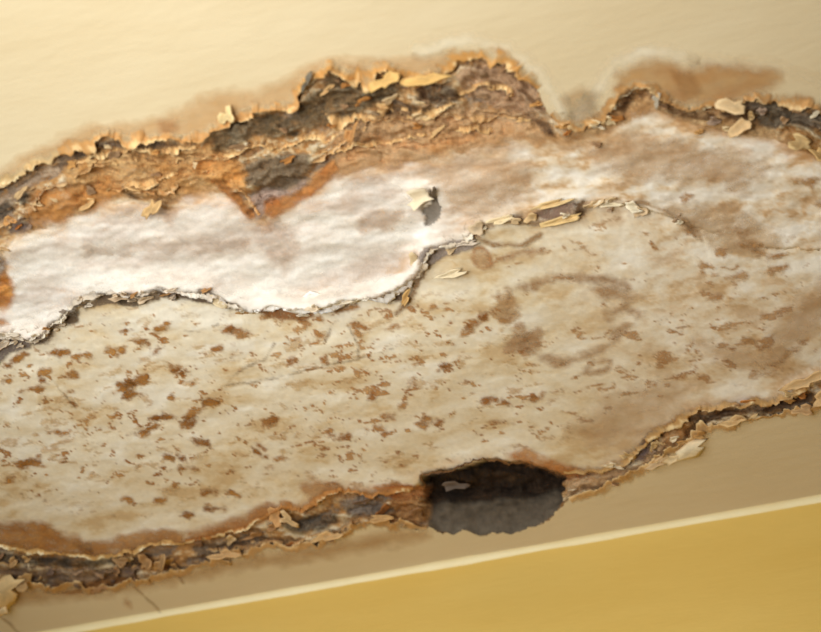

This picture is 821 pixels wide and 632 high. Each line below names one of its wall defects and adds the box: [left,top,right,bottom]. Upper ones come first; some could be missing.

damp [144,97,246,136]
damp [386,36,778,121]
corrosion [4,349,91,405]
corrosion [107,364,223,453]
damp [0,183,402,320]
corrosion [295,322,398,472]
crack [0,197,697,361]
spalling [0,48,821,341]
damp [491,294,541,356]
peeling [561,370,821,507]
corrosion [0,506,269,556]
peeling [0,482,452,616]